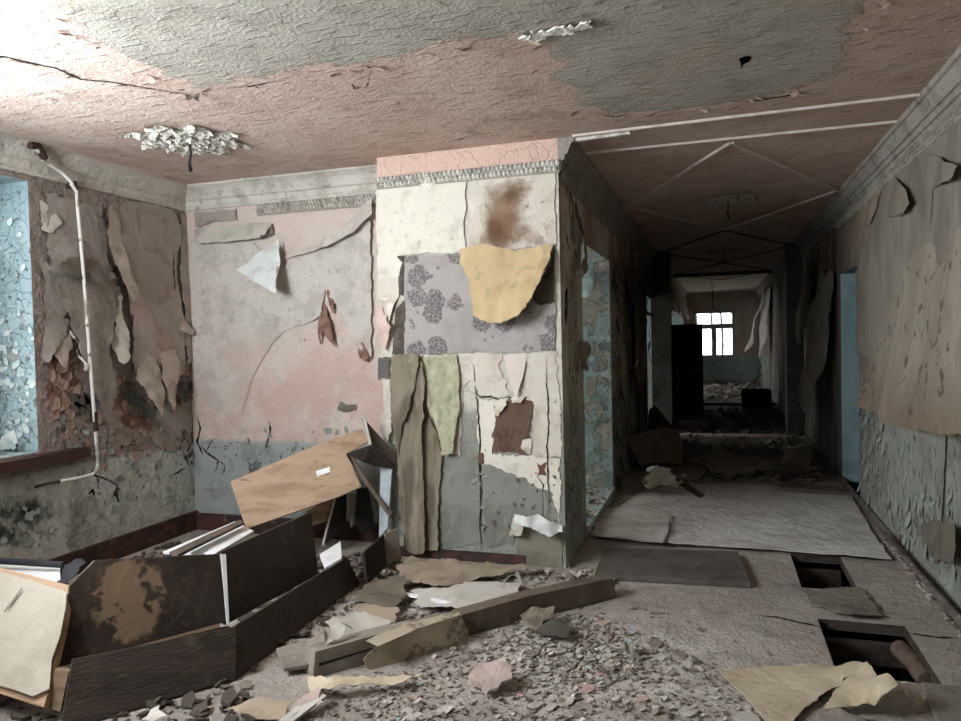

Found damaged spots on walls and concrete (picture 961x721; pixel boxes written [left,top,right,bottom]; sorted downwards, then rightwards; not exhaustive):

crack [0,56,192,95]
peeling [54,0,890,117]
peeling [40,200,62,233]
peeling [237,198,372,294]
peeling [875,174,910,218]
peeling [917,153,957,189]
peeling [439,187,626,568]
peeling [0,306,196,519]
crack [173,407,225,475]
peeling [209,412,355,477]
peeling [855,358,961,582]